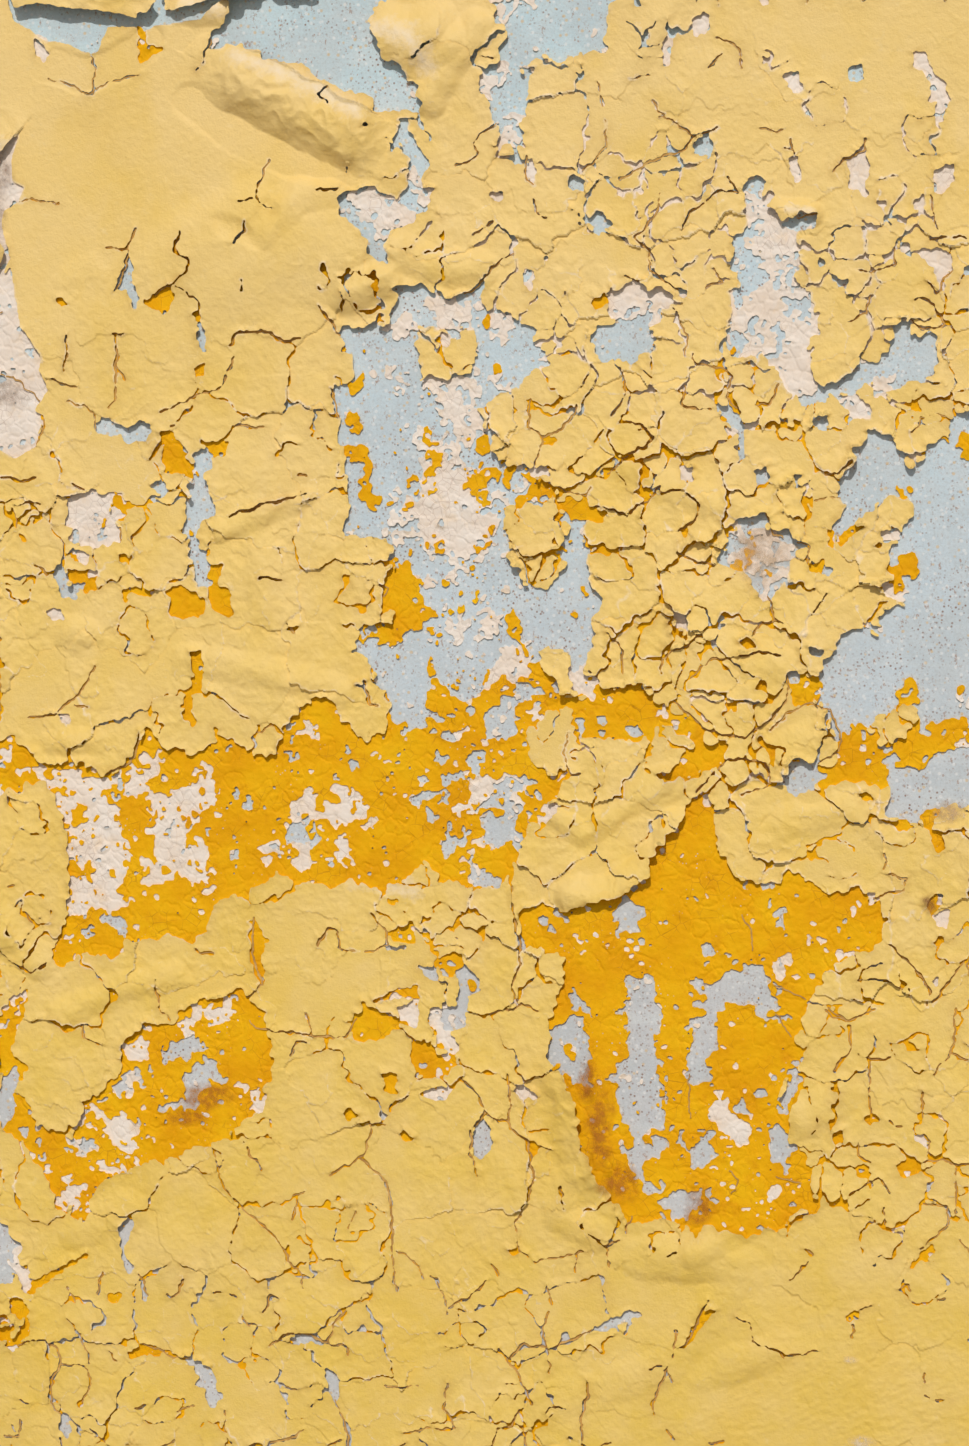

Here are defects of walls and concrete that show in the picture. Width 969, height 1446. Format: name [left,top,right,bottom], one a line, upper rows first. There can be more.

peeling [632,0,743,79]
peeling [8,0,615,264]
peeling [0,127,969,1239]
crack [489,886,539,1015]
crack [889,944,968,1075]
peeling [0,917,274,1352]
crack [460,1074,552,1205]
crack [329,1122,424,1291]
peeling [124,1340,226,1432]
crack [491,1311,592,1446]
peeling [549,1310,642,1352]
crack [664,1300,817,1383]